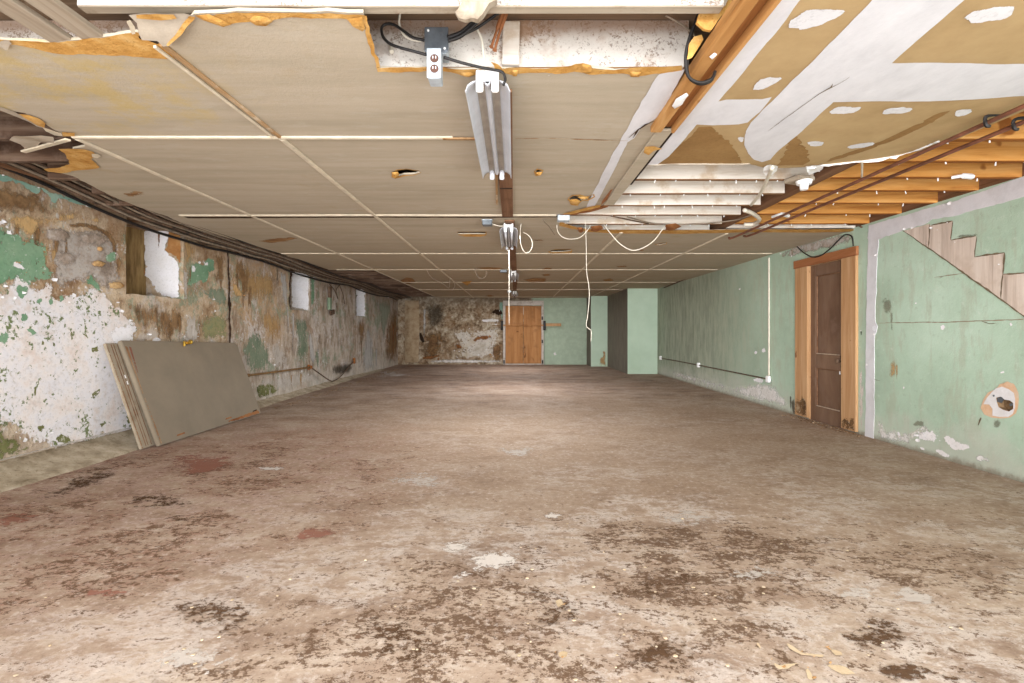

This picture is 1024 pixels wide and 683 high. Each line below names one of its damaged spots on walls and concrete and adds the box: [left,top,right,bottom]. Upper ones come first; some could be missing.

peeling [0,174,91,208]
peeling [0,220,160,448]
leakage [129,304,181,341]
peeling [144,231,245,341]
leakage [215,256,294,338]
flaking render [454,302,503,360]
flaking render [981,371,1019,419]
peeling [914,431,969,457]